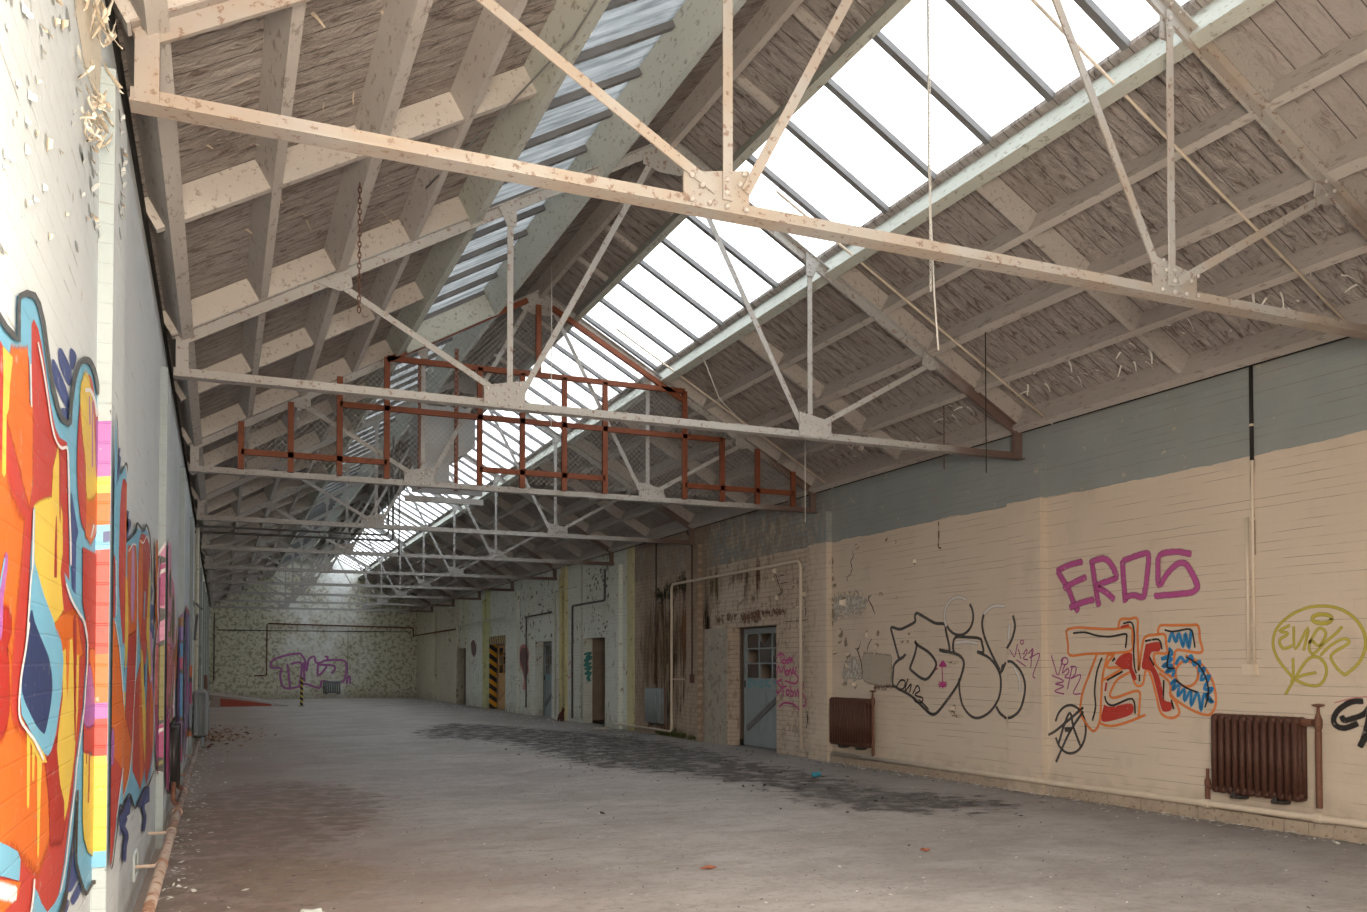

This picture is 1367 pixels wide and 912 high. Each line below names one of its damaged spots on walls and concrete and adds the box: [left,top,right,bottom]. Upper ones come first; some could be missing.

peeling [0,0,129,240]